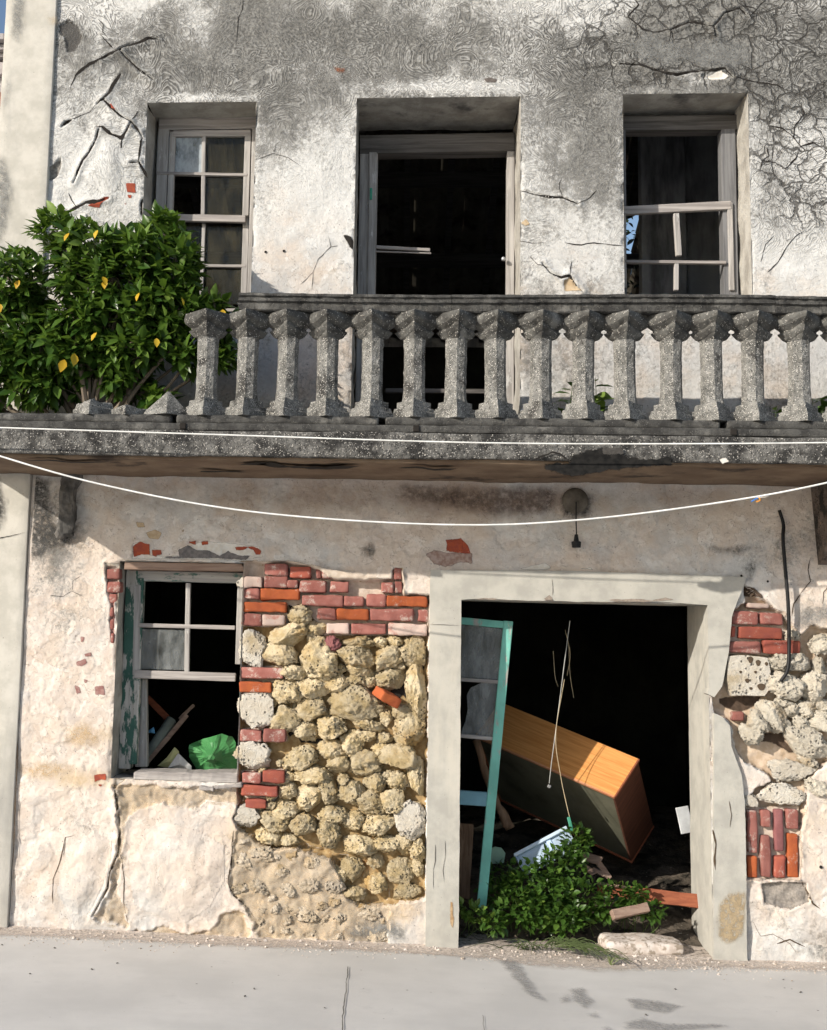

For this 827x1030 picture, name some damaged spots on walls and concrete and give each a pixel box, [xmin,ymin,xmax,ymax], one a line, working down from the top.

crack [64,19,157,226]
crack [522,178,597,204]
crack [521,241,622,291]
crack [620,0,827,169]
crack [761,232,802,271]
peeling [427,538,472,567]
spalling [94,522,429,942]
spalling [712,586,827,909]